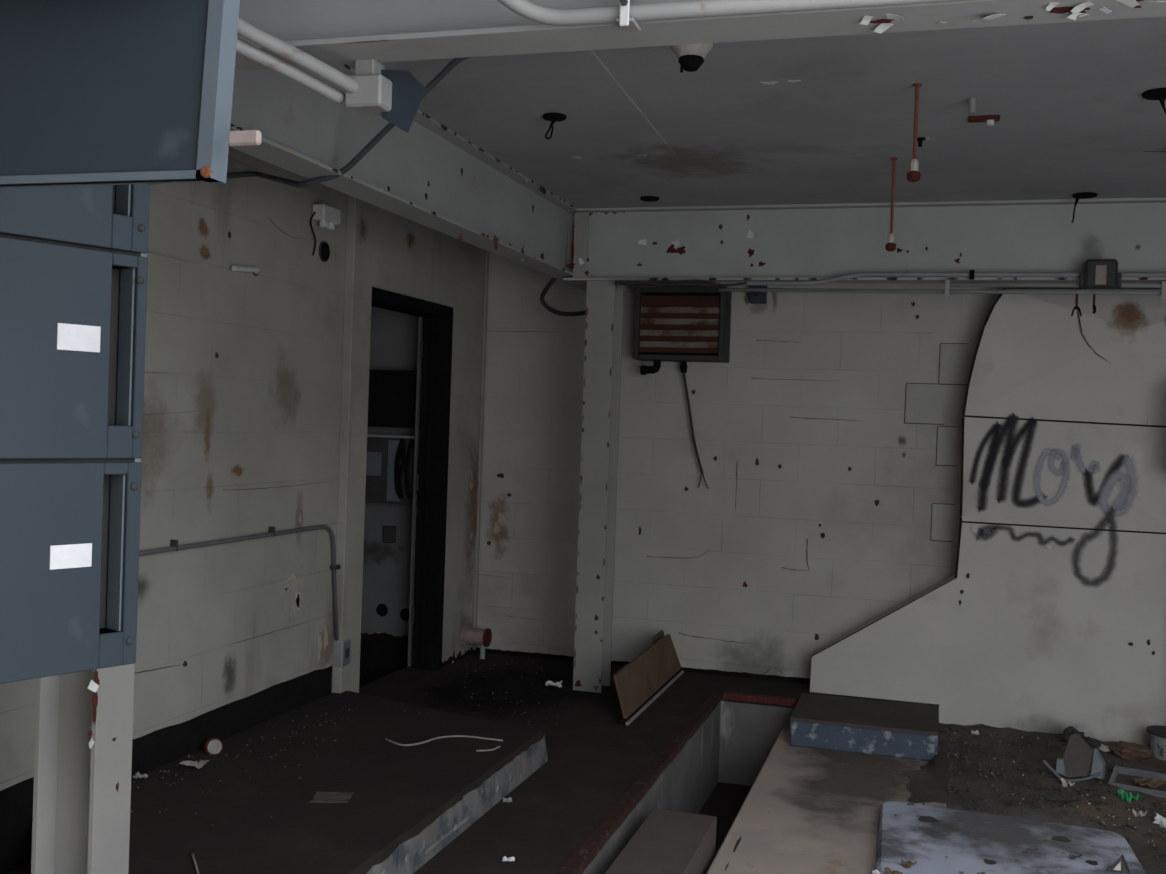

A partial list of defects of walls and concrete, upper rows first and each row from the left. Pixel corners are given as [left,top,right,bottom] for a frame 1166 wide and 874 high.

peeling [1046,0,1166,20]
corrosion [88,670,100,749]